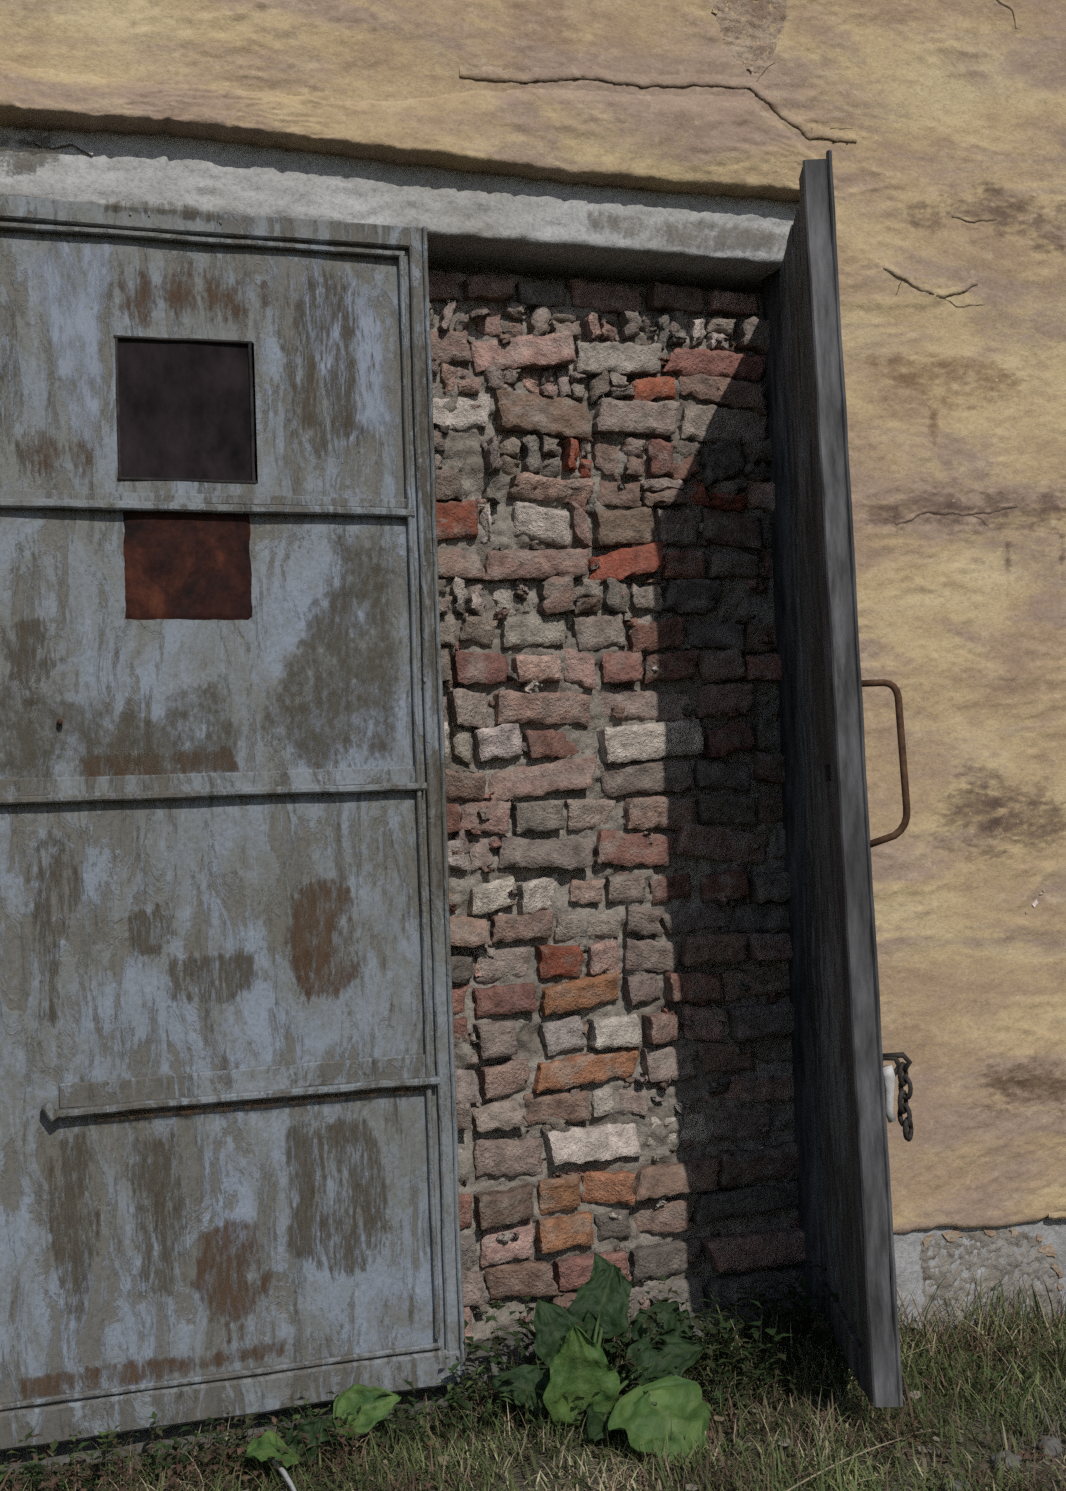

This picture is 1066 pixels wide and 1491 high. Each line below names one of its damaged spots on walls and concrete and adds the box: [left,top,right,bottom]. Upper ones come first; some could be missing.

flaking render [712,0,788,75]
crack [459,62,857,143]
crack [883,263,981,307]
corrosion [288,879,358,1001]
corrosion [21,1220,284,1400]
flaking render [919,1227,1065,1331]